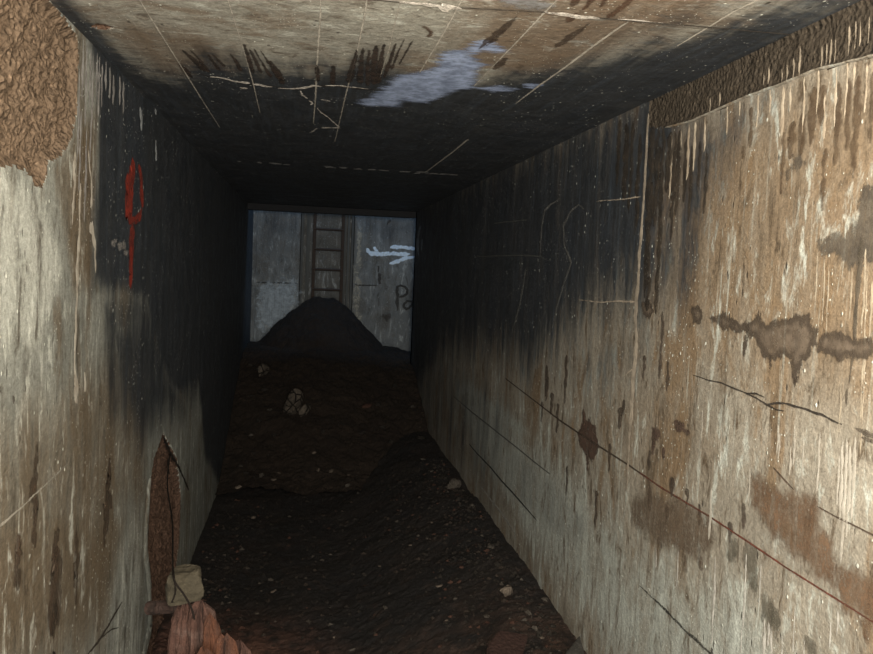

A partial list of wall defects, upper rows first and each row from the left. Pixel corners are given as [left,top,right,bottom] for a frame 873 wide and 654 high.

spalling [0,0,125,197]
damp [677,0,759,46]
spalling [645,0,873,136]
damp [739,17,873,211]
damp [577,94,728,489]
damp [541,355,568,433]
damp [691,185,873,654]
spalling [144,428,182,601]
damp [632,477,712,587]
crack [640,586,713,654]